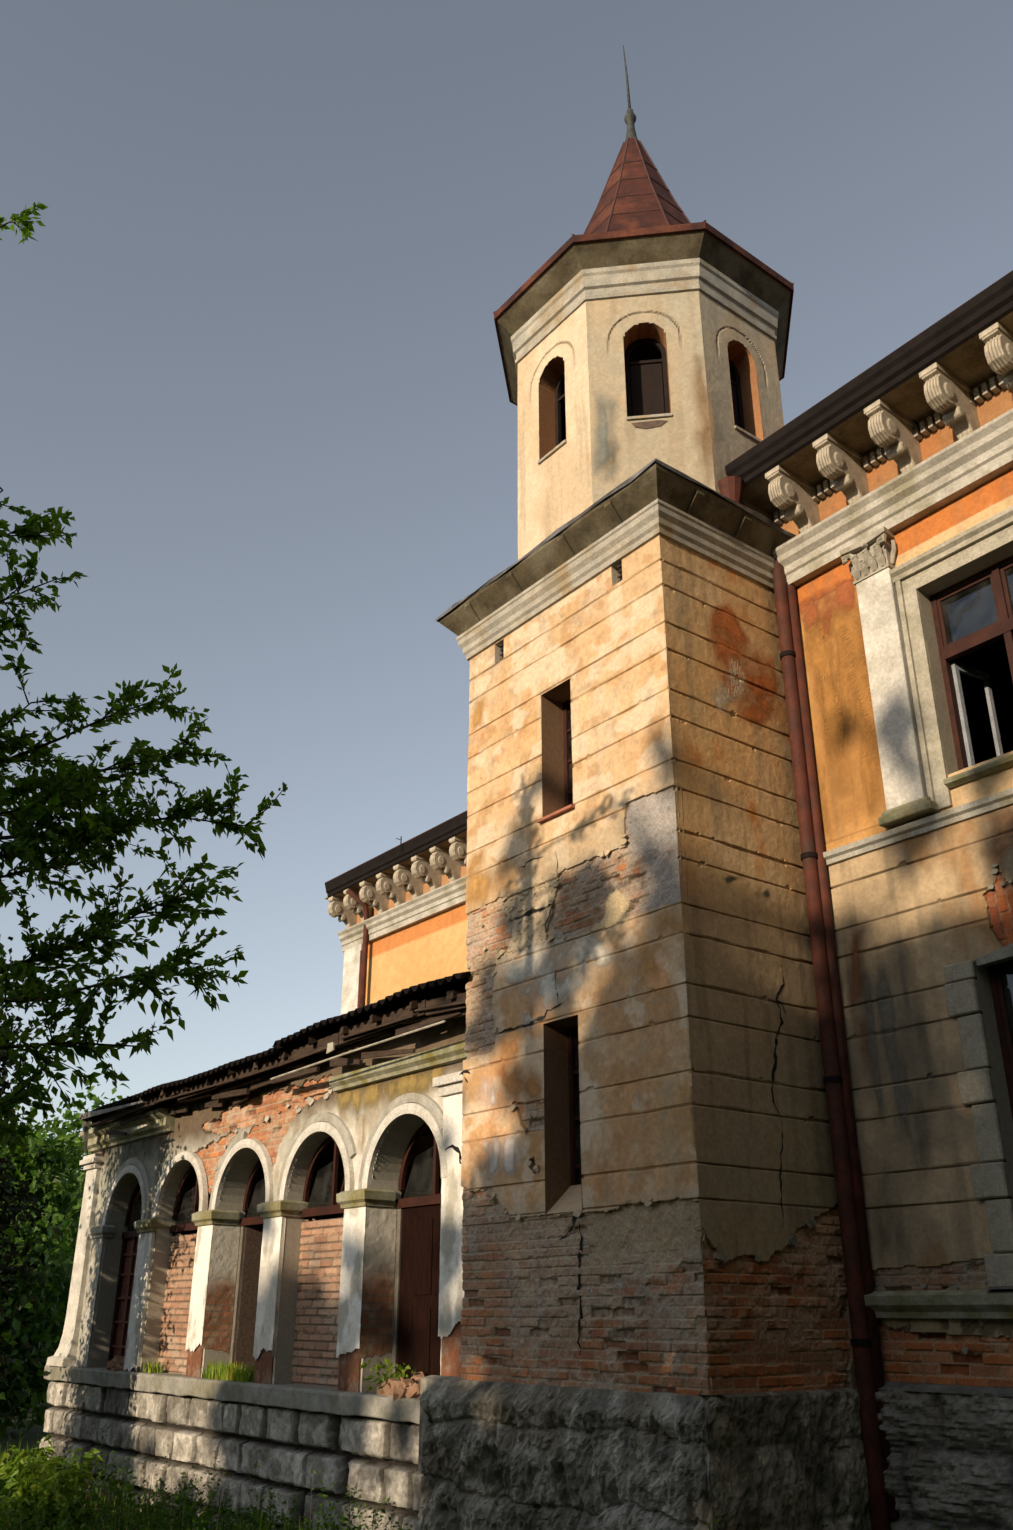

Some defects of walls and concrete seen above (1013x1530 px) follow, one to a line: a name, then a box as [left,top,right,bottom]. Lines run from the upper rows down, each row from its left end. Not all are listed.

spalling [464,897,513,1060]
spalling [543,787,684,942]
spalling [985,863,1013,946]
spalling [196,1076,333,1210]
crack [771,965,786,1227]
spalling [460,1187,852,1396]
spalling [878,1326,1013,1388]